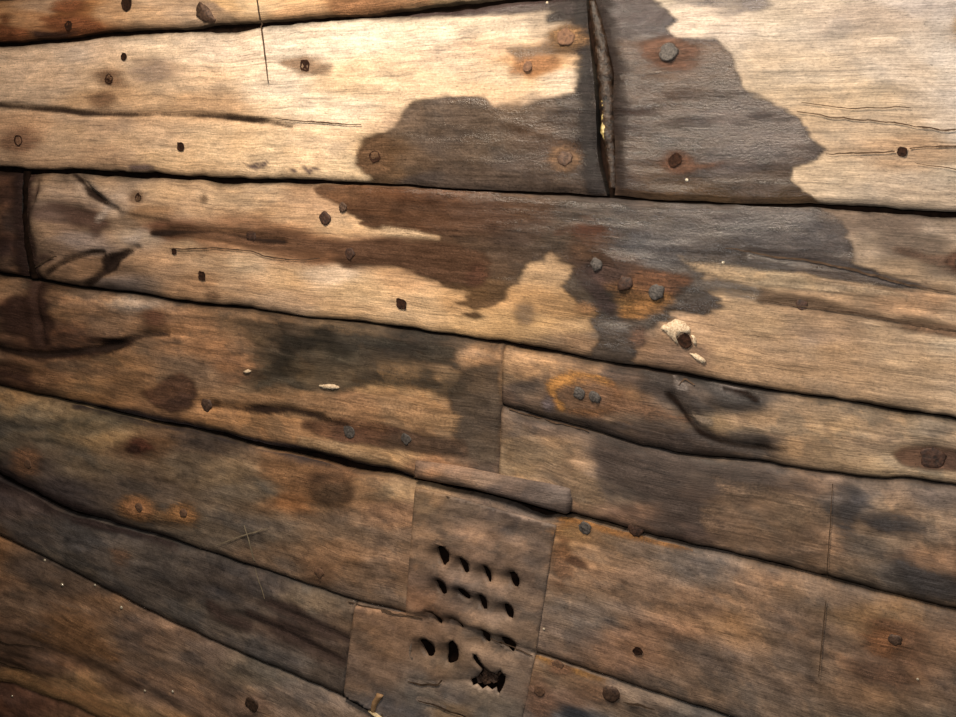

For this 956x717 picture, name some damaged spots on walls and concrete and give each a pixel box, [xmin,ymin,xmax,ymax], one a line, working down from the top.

corrosion [511,26,587,75]
damp [0,173,132,361]
damp [154,0,956,555]
corrosion [571,225,691,318]
damp [73,400,388,467]
crack [666,378,787,450]
damp [896,559,956,599]